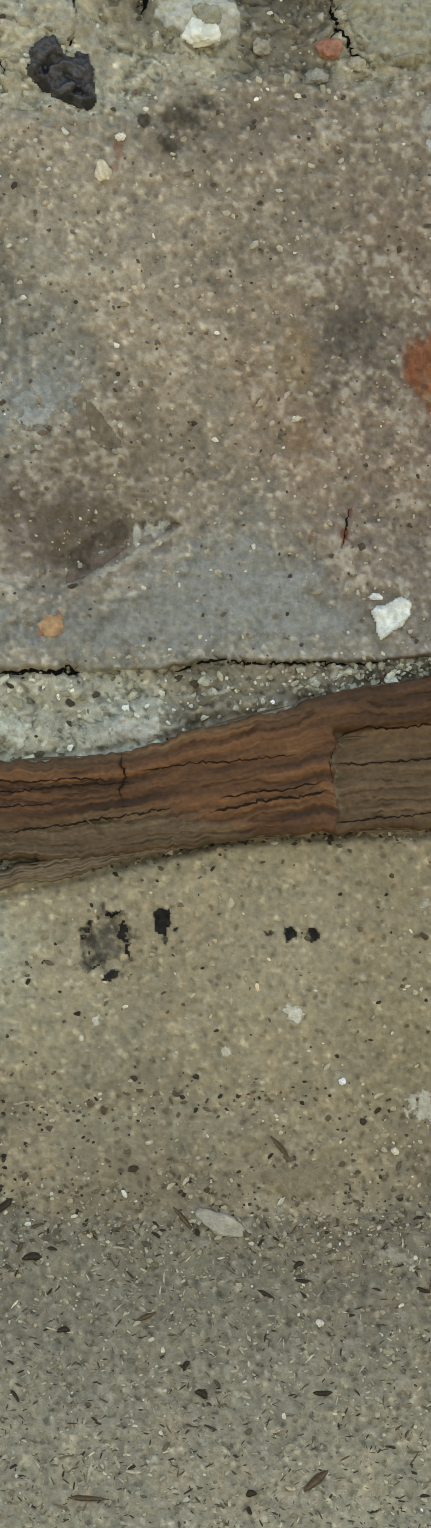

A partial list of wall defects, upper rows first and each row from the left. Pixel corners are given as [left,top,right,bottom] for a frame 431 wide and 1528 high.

crack [0,664,82,677]
crack [175,655,378,672]